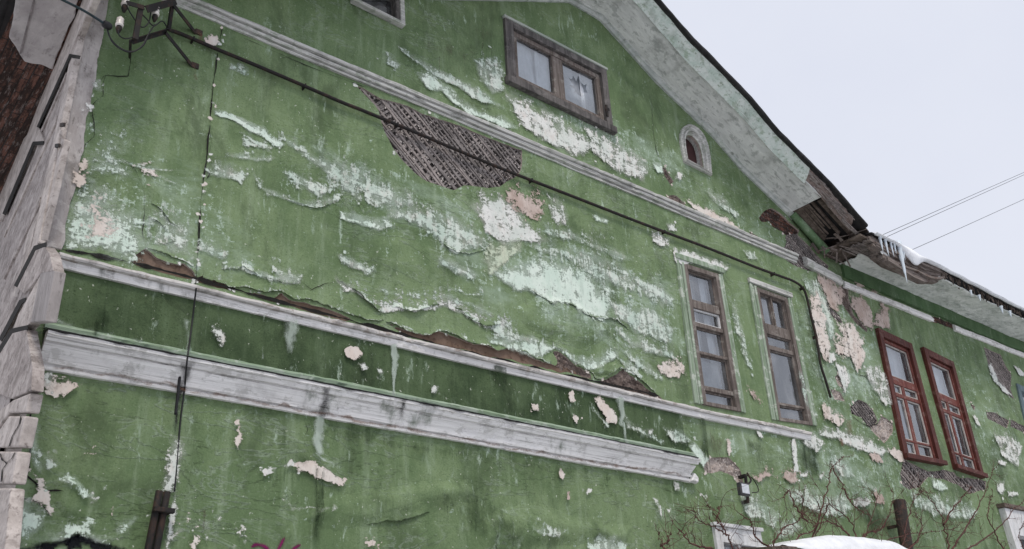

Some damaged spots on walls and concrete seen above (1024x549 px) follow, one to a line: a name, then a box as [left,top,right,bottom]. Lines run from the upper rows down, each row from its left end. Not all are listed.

crack [0,26,659,397]
peeling [377,46,752,233]
flaking render [44,372,82,398]
peeling [60,82,1004,549]
flaking render [984,348,1024,399]